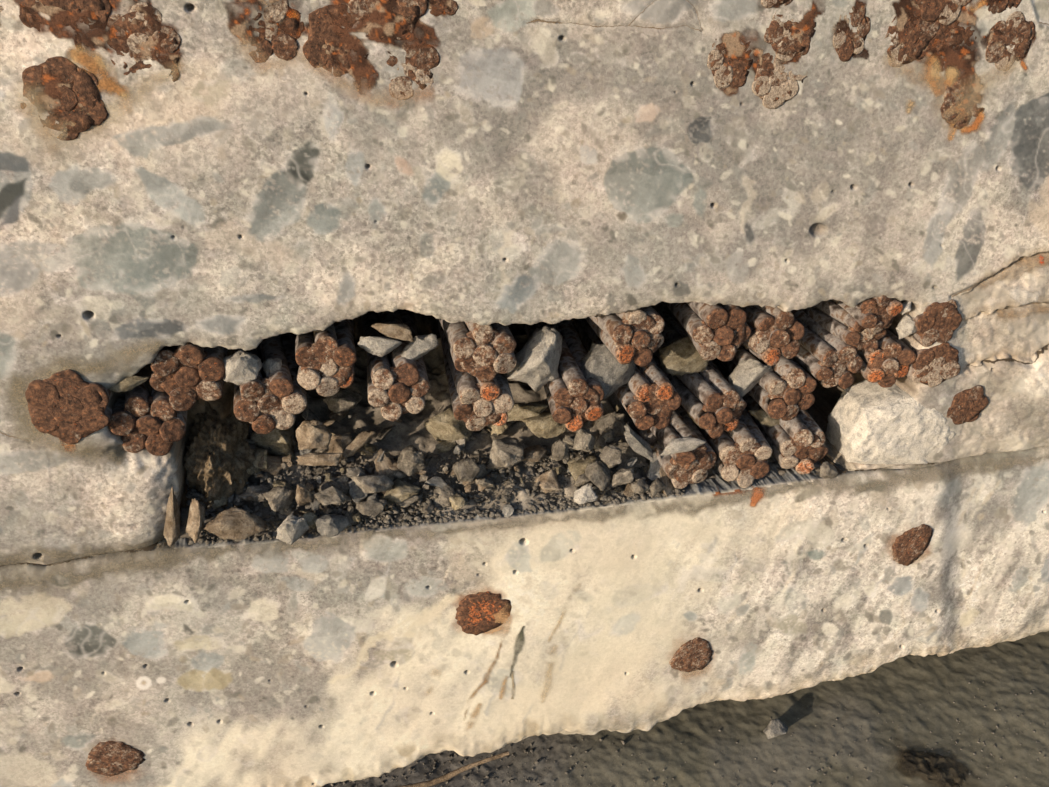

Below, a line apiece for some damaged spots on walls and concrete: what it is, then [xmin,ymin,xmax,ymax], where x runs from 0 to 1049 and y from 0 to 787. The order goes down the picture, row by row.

corrosion [14,0,181,98]
corrosion [322,0,452,92]
corrosion [780,1,824,64]
corrosion [834,0,869,59]
corrosion [893,0,1036,140]
crack [952,252,1048,297]
spalling [135,353,158,396]
spalling [414,312,440,338]
spalling [888,298,921,349]
crack [969,344,1049,367]
spalling [792,357,871,470]
spalling [171,381,252,514]